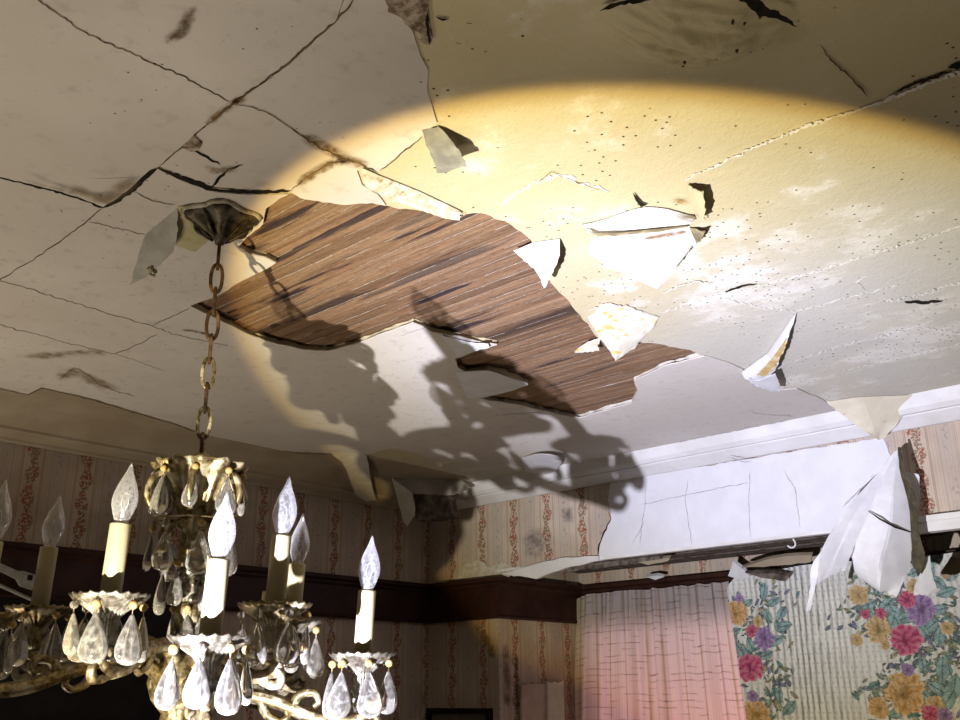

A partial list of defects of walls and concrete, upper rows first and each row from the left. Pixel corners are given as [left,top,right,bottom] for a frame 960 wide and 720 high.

peeling [422,126,466,173]
crack [685,45,960,181]
crack [0,0,421,434]
peeling [361,168,466,220]
peeling [455,370,528,398]
peeling [513,239,560,288]
peeling [575,304,659,361]
crack [633,193,647,207]
peeling [582,184,706,289]
peeling [742,314,796,392]
crack [589,226,960,371]
flaking render [598,395,912,557]